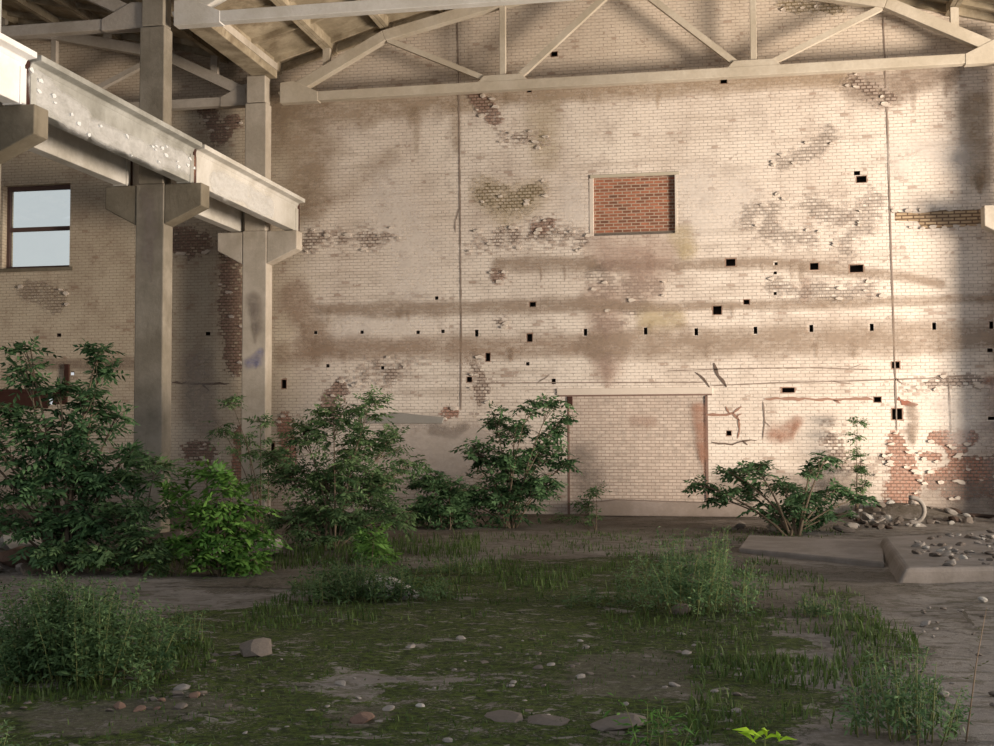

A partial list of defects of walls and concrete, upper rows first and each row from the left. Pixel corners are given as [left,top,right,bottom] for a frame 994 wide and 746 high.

spalling [891,207,981,229]
spalling [172,226,242,377]
leakage [281,233,994,361]
spalling [899,372,990,395]
spalling [817,396,994,503]